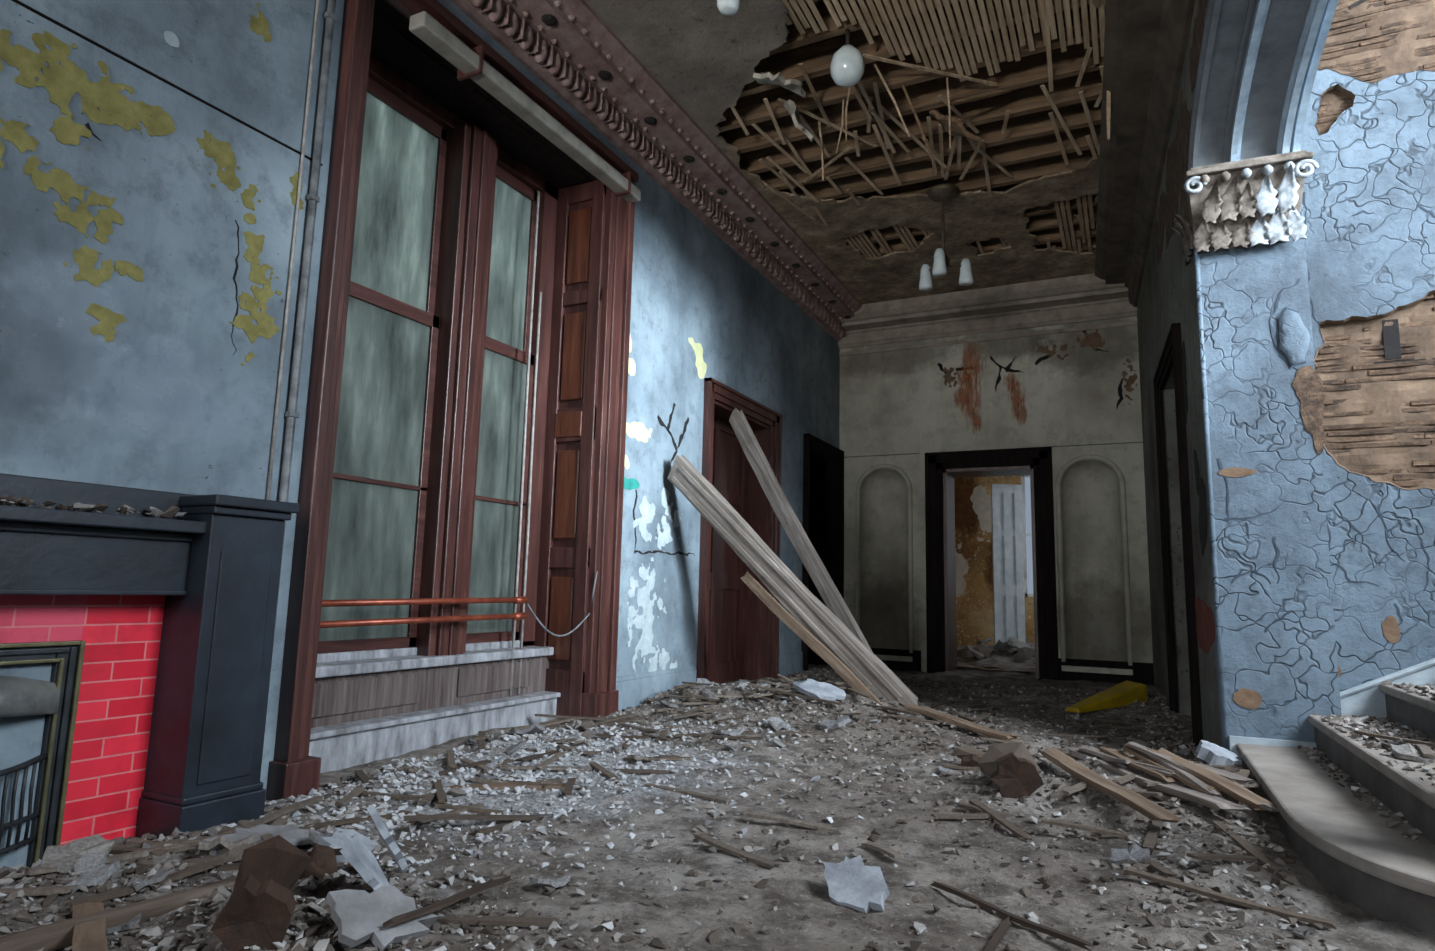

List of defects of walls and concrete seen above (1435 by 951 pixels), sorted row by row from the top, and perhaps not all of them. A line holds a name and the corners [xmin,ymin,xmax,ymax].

peeling [0,25,282,366]
spalling [730,63,1014,227]
spalling [781,0,1106,165]
spalling [1046,195,1097,253]
crack [1269,192,1318,370]
spalling [1315,0,1435,135]
crack [1417,203,1435,218]
corrosion [955,348,981,429]
corrosion [1007,377,1026,422]
spalling [1292,290,1435,490]
peeling [955,485,992,597]
crack [1217,458,1430,632]